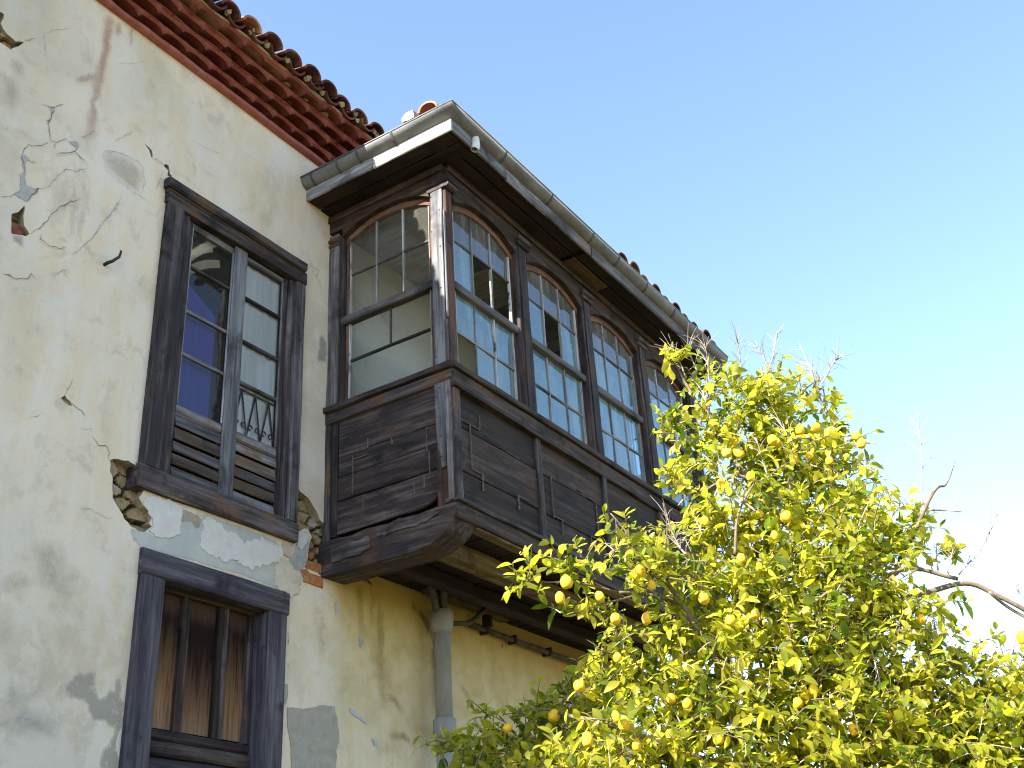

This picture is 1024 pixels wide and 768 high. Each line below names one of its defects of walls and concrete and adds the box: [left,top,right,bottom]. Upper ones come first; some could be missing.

spalling [0,12,24,49]
spalling [11,155,39,236]
crack [1,104,165,279]
crack [66,378,111,460]
peeling [110,459,323,589]
peeling [70,675,123,768]